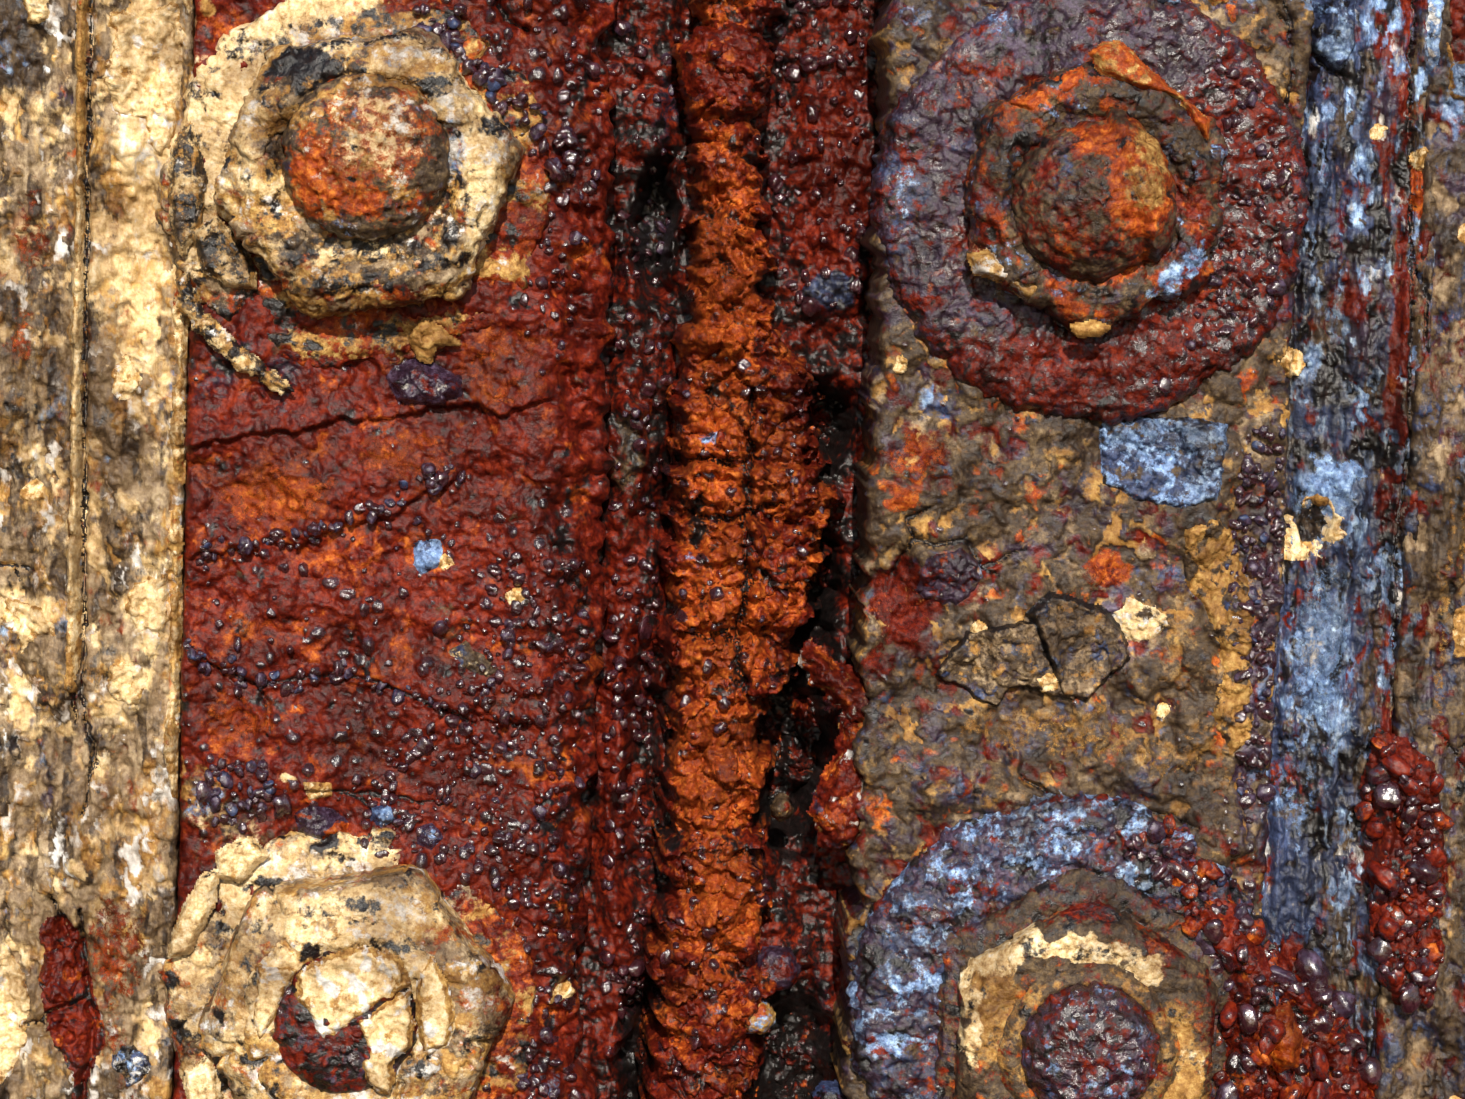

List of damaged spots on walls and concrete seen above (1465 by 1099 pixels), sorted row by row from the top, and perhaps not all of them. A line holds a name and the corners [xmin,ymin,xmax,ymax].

rust [412,0,605,351]
rust [608,0,870,516]
rust [966,248,1037,301]
rust [1011,40,1299,362]
rust [386,320,463,405]
rust [678,539,789,609]
rust [182,432,660,964]
peeling [165,836,270,959]
rust [599,659,802,1032]
peeling [182,1054,224,1099]
peeling [253,945,455,1095]
rust [515,985,582,1099]